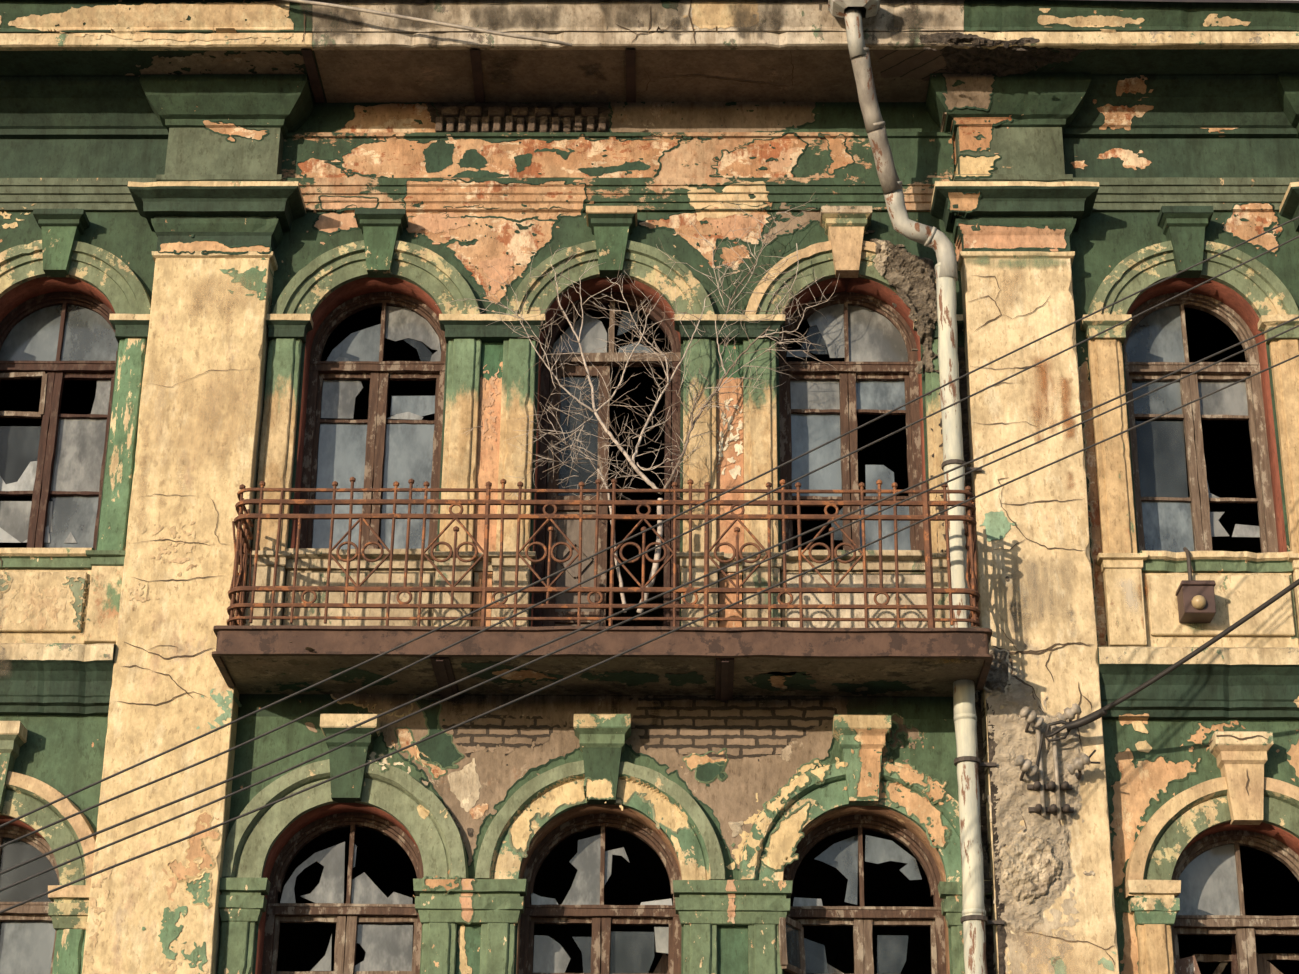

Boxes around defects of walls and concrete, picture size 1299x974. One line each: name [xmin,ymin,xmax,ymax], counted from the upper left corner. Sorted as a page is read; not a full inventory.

peeling [0,0,305,76]
peeling [0,204,34,229]
peeling [296,102,855,312]
crack [969,275,1051,332]
crack [993,477,1083,551]
crack [991,627,1092,751]
peeling [1276,696,1299,782]
peeling [162,811,221,901]
flaking render [330,663,952,974]
spalling [975,648,1095,974]
peeling [1109,713,1246,892]